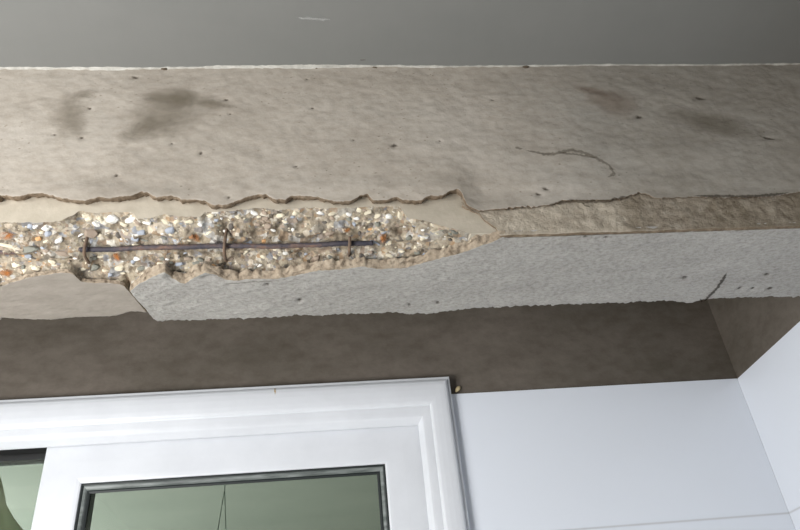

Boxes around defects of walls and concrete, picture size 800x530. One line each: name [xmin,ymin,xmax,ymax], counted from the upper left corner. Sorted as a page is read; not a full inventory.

spalling [0,206,469,289]
crack [700,274,727,302]